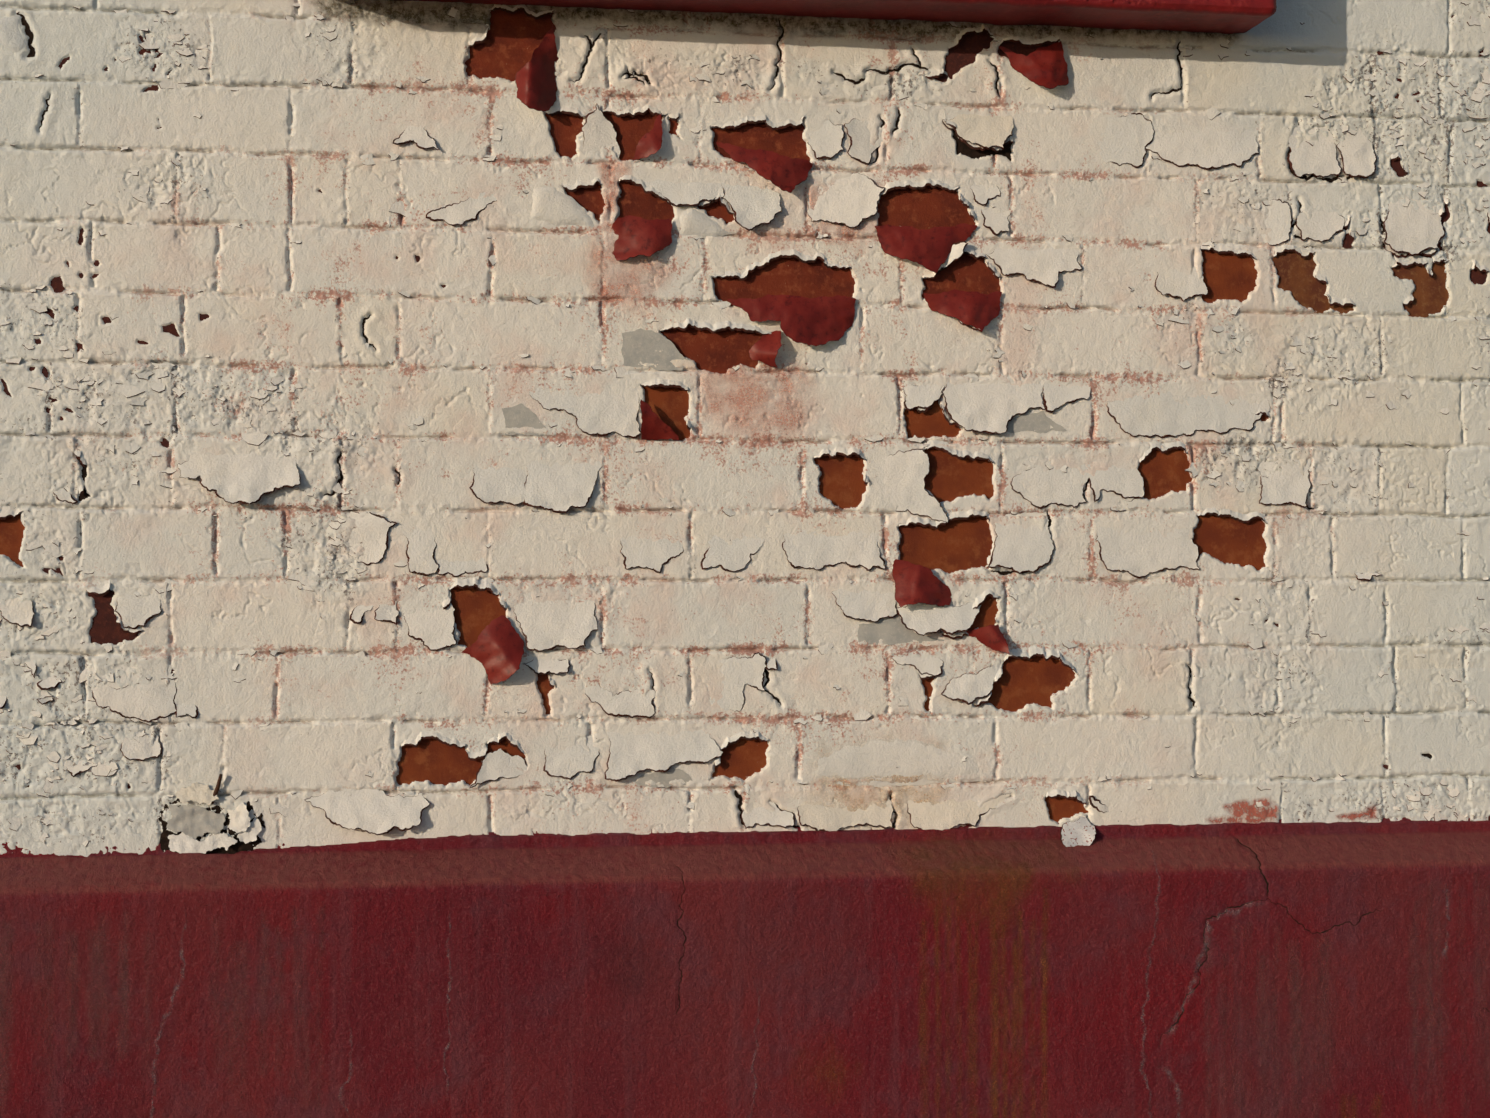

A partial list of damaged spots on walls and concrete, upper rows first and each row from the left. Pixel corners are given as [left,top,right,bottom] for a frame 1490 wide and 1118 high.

peeling [104,9,210,92]
peeling [1097,49,1490,354]
peeling [1,260,228,438]
peeling [53,449,91,504]
peeling [104,376,603,714]
peeling [620,534,684,573]
peeling [701,333,1413,725]
peeling [0,506,198,844]
peeling [158,682,1016,854]
peeling [1045,773,1128,847]
peeling [1376,764,1469,821]
crack [1141,837,1382,1090]